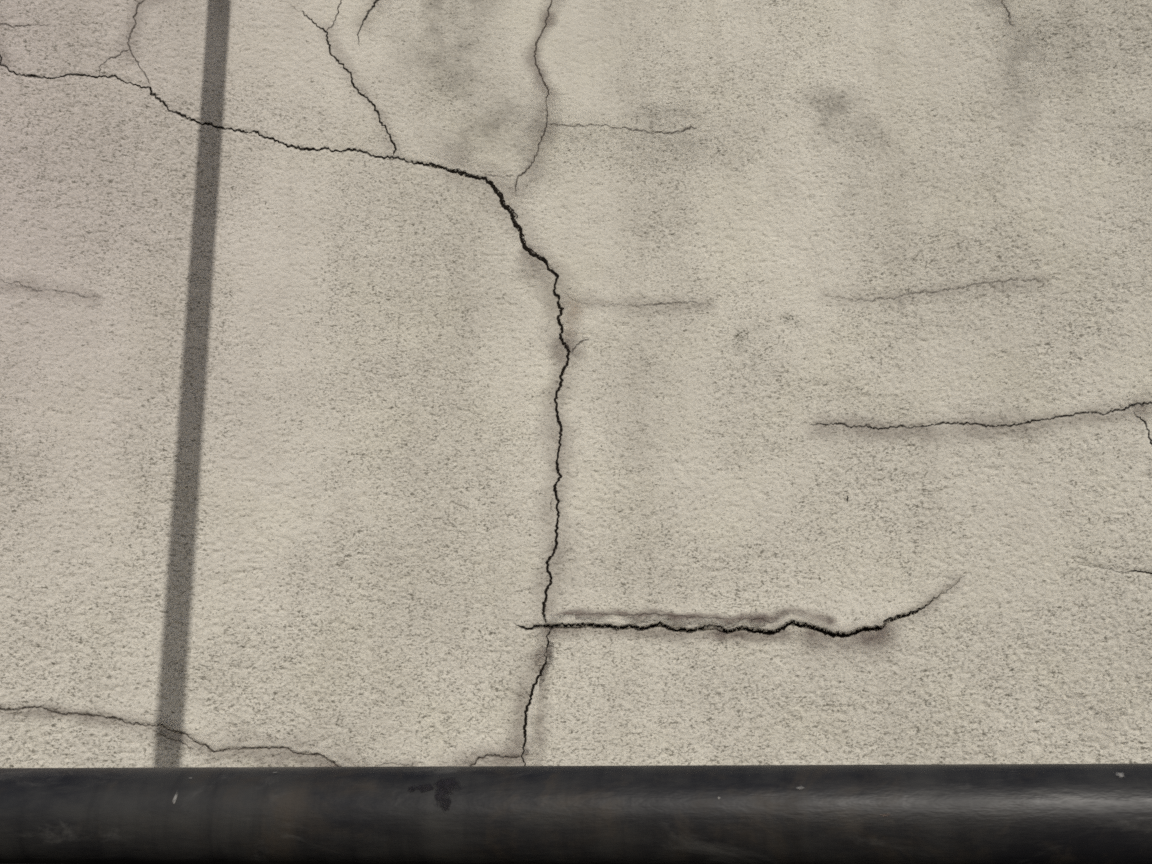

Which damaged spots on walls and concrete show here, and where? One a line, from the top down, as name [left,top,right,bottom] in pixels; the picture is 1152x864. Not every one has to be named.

crack [0,0,952,767]
crack [813,401,1152,444]